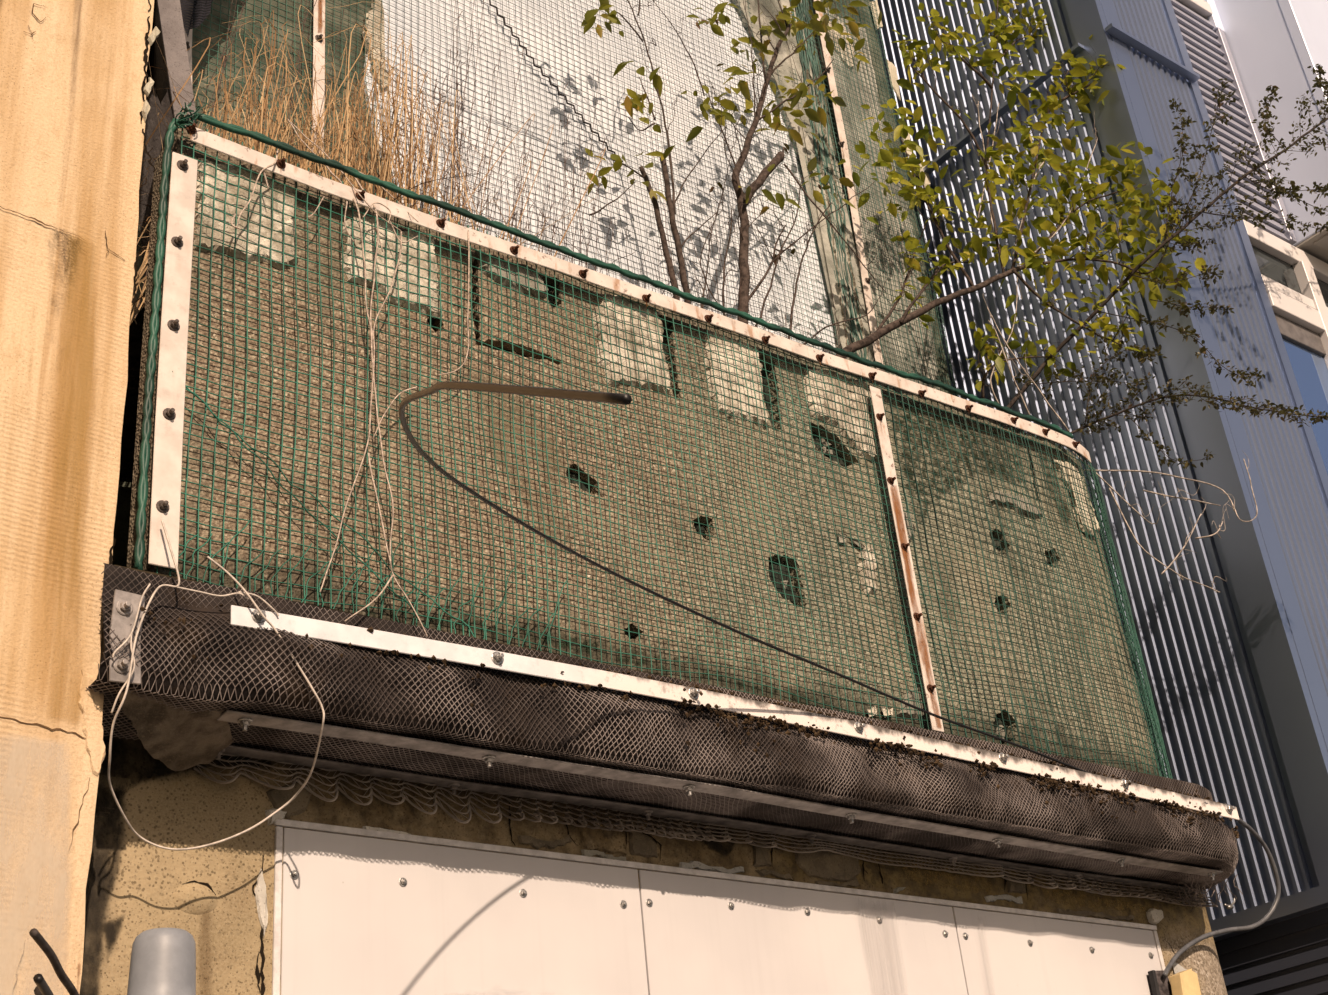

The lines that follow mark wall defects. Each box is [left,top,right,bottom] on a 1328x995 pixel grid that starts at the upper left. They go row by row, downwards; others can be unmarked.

crack [0,206,124,260]
rust [891,488,941,727]
crack [0,716,86,739]
crack [68,778,90,852]
water stain [80,788,124,995]